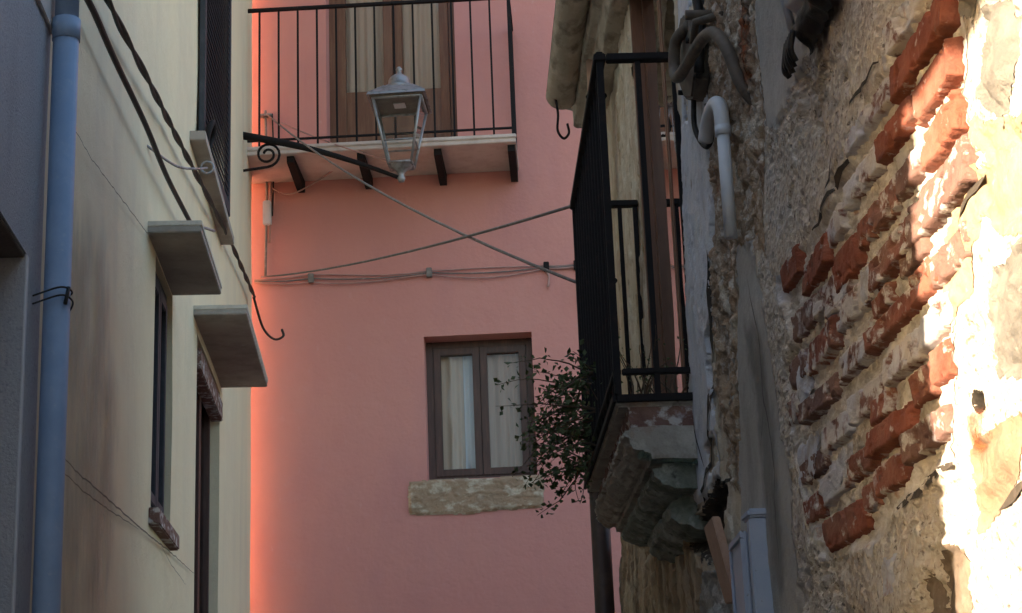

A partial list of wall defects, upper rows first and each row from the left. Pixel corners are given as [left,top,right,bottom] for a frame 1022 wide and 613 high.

crack [65,459,194,584]
spalling [619,0,766,613]
spalling [775,0,1022,563]
spalling [923,543,973,613]